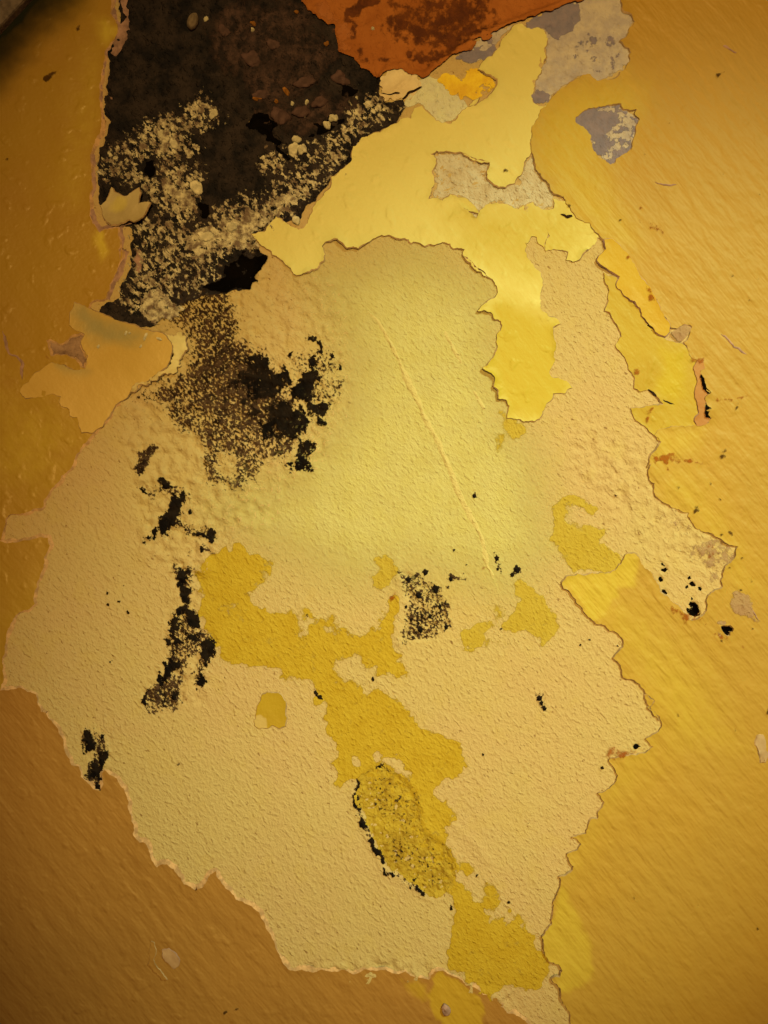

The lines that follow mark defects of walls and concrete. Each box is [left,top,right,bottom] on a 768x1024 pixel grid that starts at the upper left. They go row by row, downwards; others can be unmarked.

flaking render [90,0,639,327]
peeling [603,272,711,442]
damp [81,728,109,790]
peeling [254,691,288,729]
damp [133,267,559,1002]
peeling [162,948,180,969]